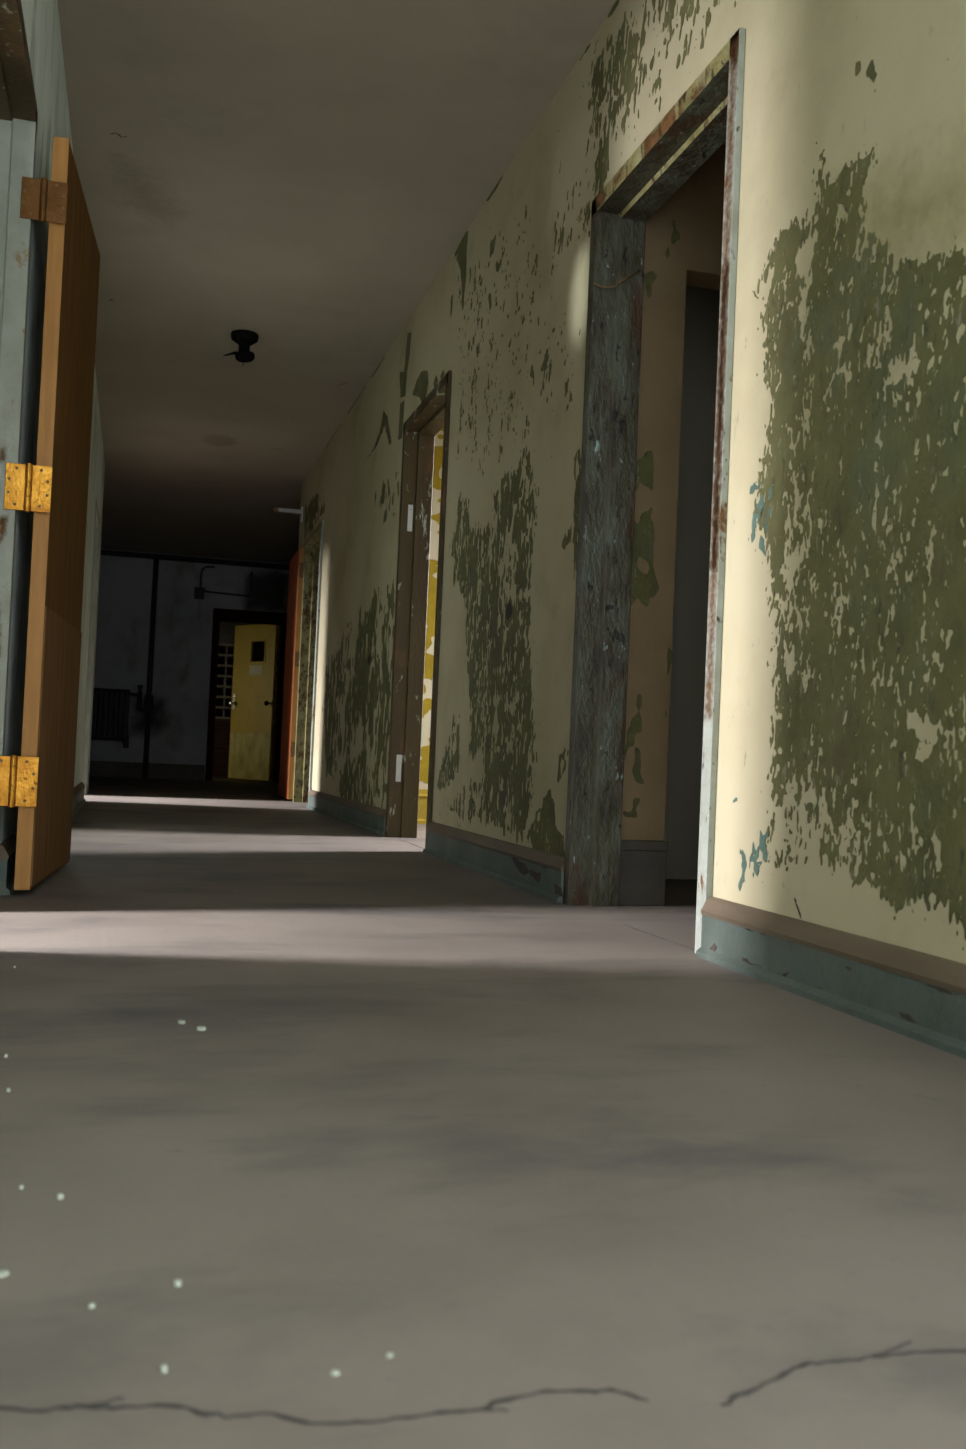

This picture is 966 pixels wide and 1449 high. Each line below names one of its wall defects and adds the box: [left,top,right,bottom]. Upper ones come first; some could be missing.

peeling [855,59,877,92]
peeling [367,0,736,883]
peeling [738,142,966,950]
peeling [322,579,395,808]
crack [0,1387,648,1425]
crack [721,1340,966,1406]